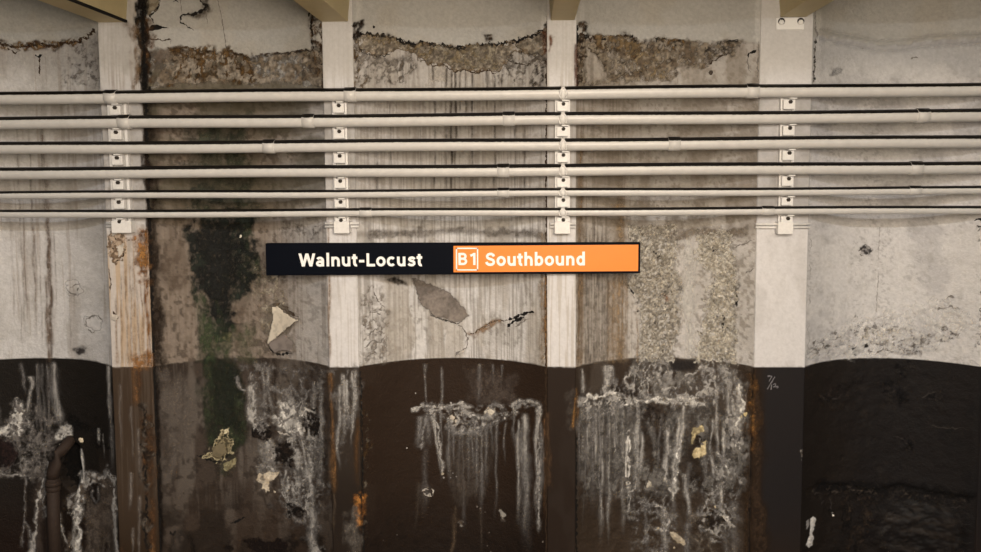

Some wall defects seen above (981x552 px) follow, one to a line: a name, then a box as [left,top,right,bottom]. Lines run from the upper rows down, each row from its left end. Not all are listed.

spalling [149,15,323,88]
spalling [352,20,547,88]
spalling [576,21,741,86]
leakage [0,220,72,552]
leakage [60,449,119,552]
corrosion [116,230,156,552]
leakage [236,362,359,552]
corrosion [353,495,366,526]
peeling [412,278,469,356]
efflorescence [411,364,544,552]
spalling [626,222,682,363]
leakage [576,273,749,552]